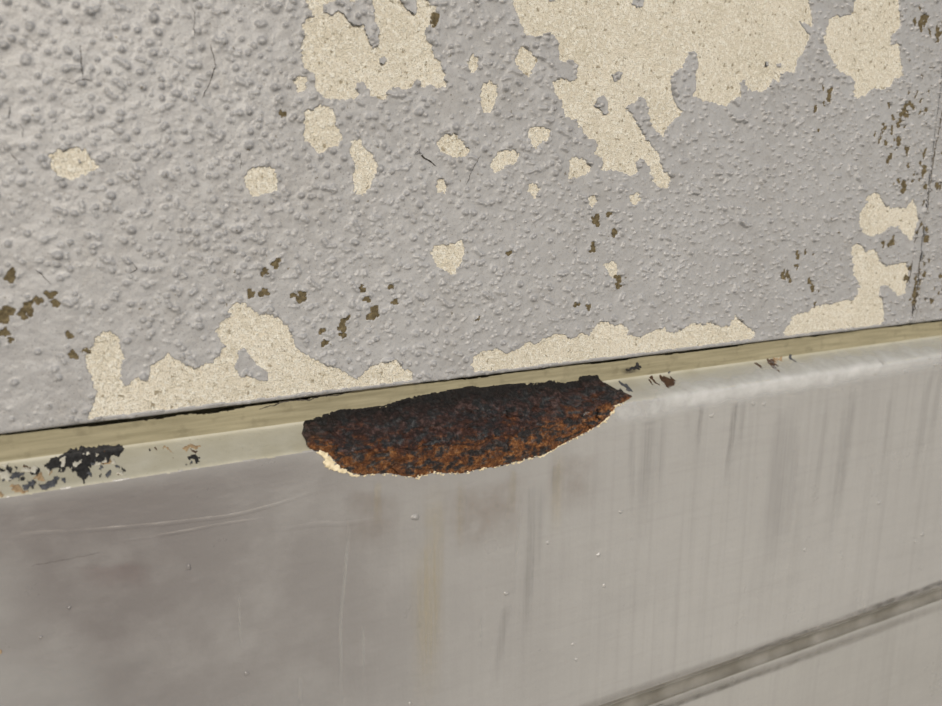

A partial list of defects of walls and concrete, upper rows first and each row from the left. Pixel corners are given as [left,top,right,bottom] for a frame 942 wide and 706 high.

peeling [292,0,447,196]
peeling [513,0,812,188]
peeling [823,0,904,99]
peeling [913,5,942,43]
peeling [48,147,99,180]
peeling [780,90,942,336]
crack [909,113,942,314]
peeling [0,290,61,343]
peeling [65,258,412,420]
corrosion [302,362,642,480]
peeling [470,315,755,372]
corrosion [649,371,676,389]